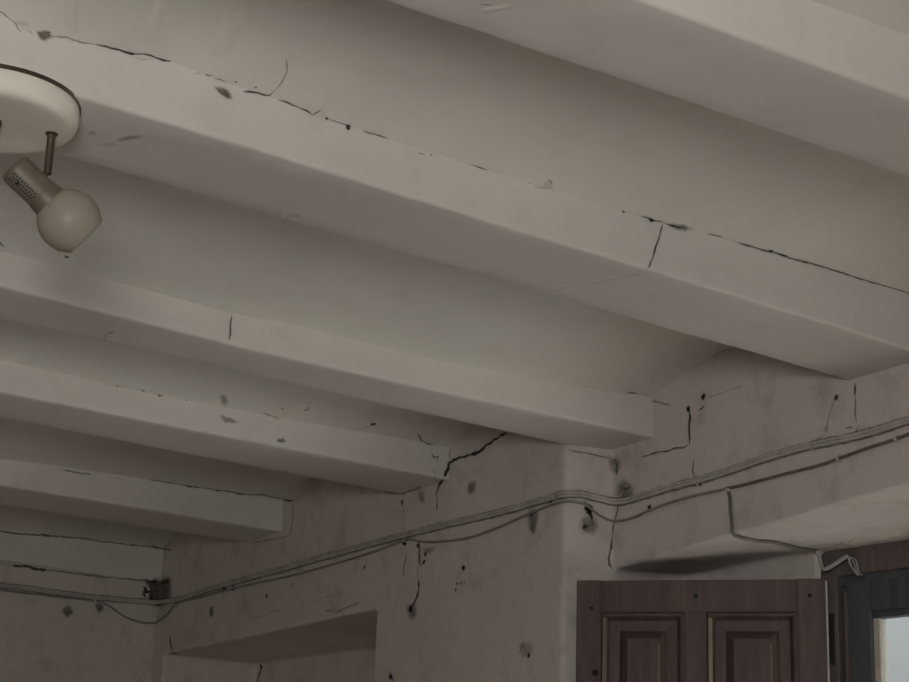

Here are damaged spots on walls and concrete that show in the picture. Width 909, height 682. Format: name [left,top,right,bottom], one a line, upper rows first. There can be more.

crack [62,37,171,62]
crack [205,74,385,138]
crack [592,216,663,284]
crack [739,243,909,294]
crack [834,384,858,431]
crack [385,432,507,509]
crack [645,394,705,487]
crack [1,531,172,551]
crack [409,542,428,616]